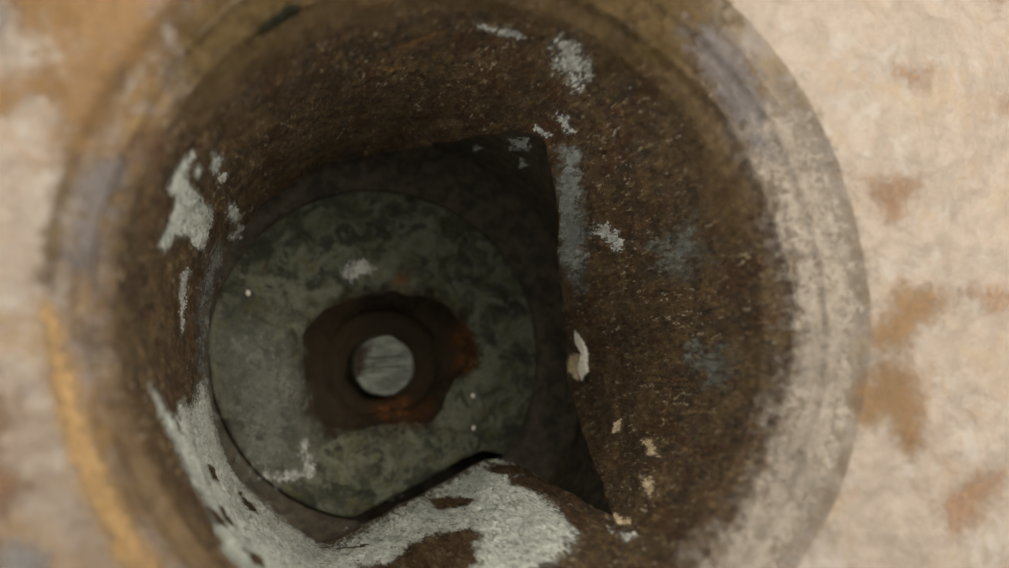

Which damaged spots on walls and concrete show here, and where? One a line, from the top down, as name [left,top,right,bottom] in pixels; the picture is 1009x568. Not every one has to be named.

rust [875,289,939,345]
rust [296,286,472,439]
rust [857,364,926,451]
rust [483,463,562,496]
rust [207,504,237,529]
rust [428,496,474,509]
rust [243,547,266,568]
rust [355,528,483,568]